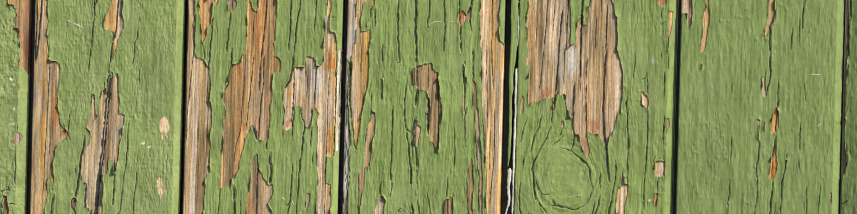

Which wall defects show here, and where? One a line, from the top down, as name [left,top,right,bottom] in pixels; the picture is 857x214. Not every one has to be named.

peeling [7,0,68,214]
peeling [72,0,125,214]
peeling [183,0,377,214]
crack [186,0,495,214]
peeling [411,62,442,153]
peeling [443,198,453,214]
peeling [456,0,505,214]
peeling [519,0,623,157]
crack [519,0,669,214]
peeling [615,177,629,214]
peeling [656,0,710,52]
peeling [757,106,788,180]